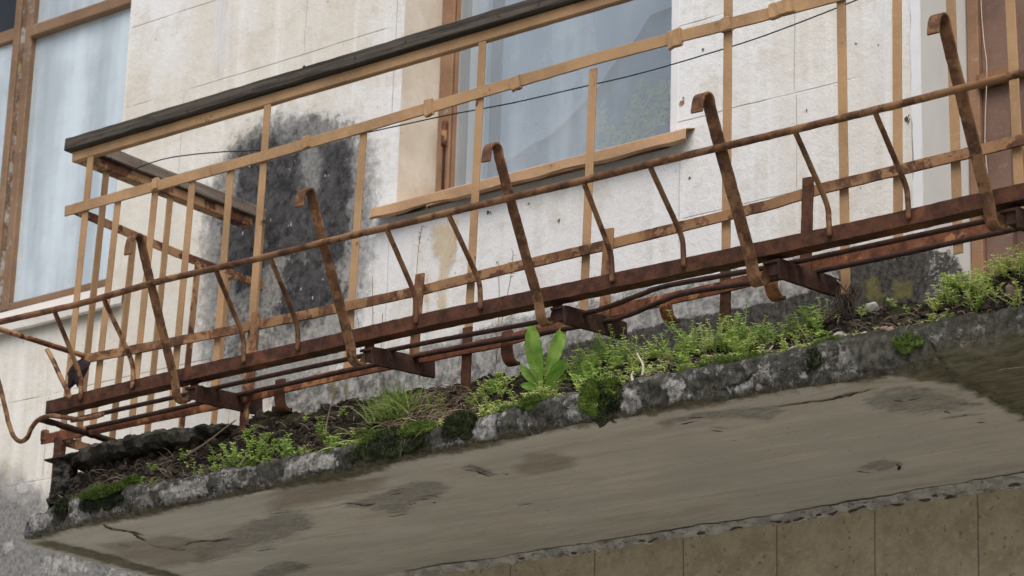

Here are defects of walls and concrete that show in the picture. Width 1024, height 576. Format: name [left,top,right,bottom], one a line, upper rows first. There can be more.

leakage [200,114,374,363]
rust [424,218,457,309]
crack [103,525,228,551]